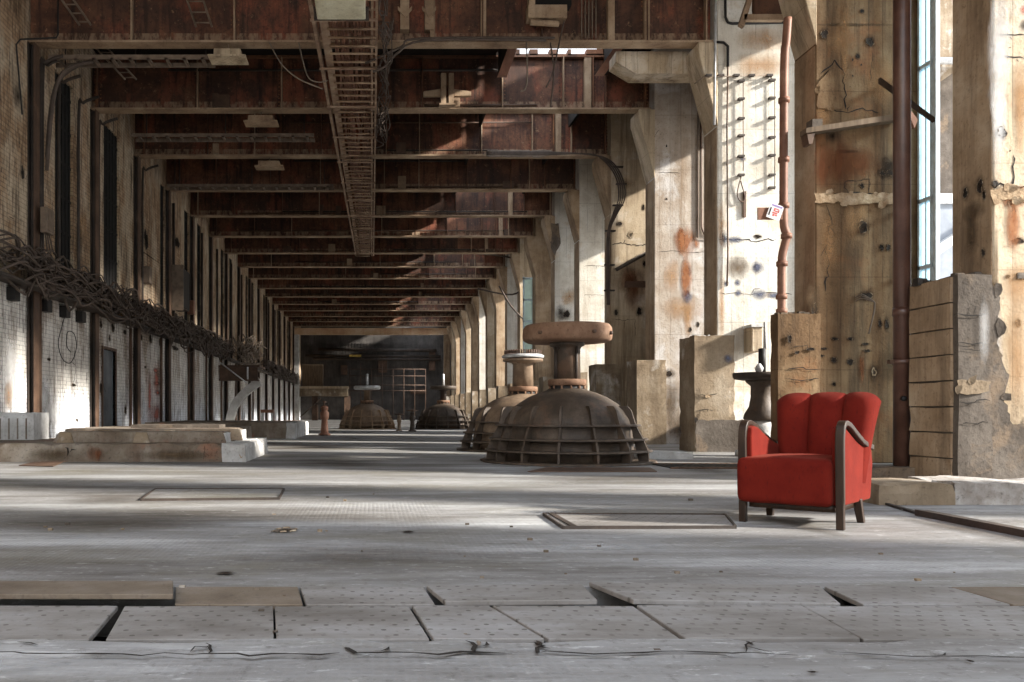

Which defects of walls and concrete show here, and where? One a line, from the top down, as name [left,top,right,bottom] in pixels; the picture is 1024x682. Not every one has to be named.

crack [818,59,879,113]
spalling [962,178,1024,205]
rust [669,230,699,292]
peeling [955,272,1024,479]
crack [0,640,499,657]